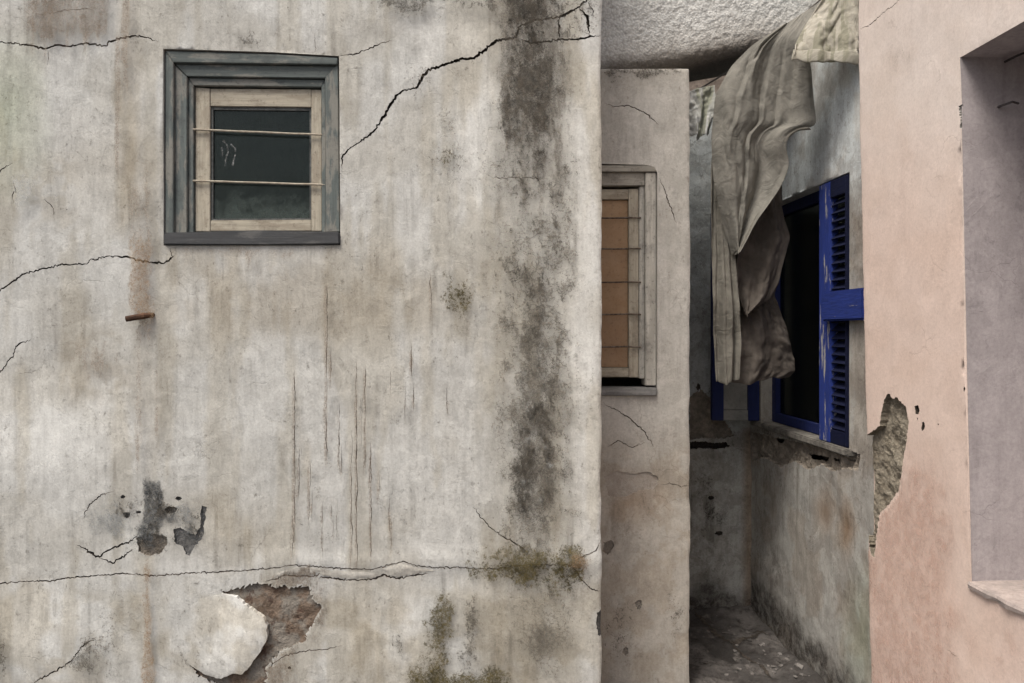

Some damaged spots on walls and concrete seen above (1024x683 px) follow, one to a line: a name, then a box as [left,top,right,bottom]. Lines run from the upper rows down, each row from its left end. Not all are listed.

crack [1,35,158,59]
damp [377,0,433,14]
crack [341,0,599,167]
crack [0,251,173,291]
corrosion [128,237,154,324]
damp [456,0,597,530]
crack [0,293,601,591]
spalling [751,432,860,472]
spalling [868,394,909,557]
spalling [136,506,207,556]
spalling [186,582,322,683]
damp [457,597,478,674]